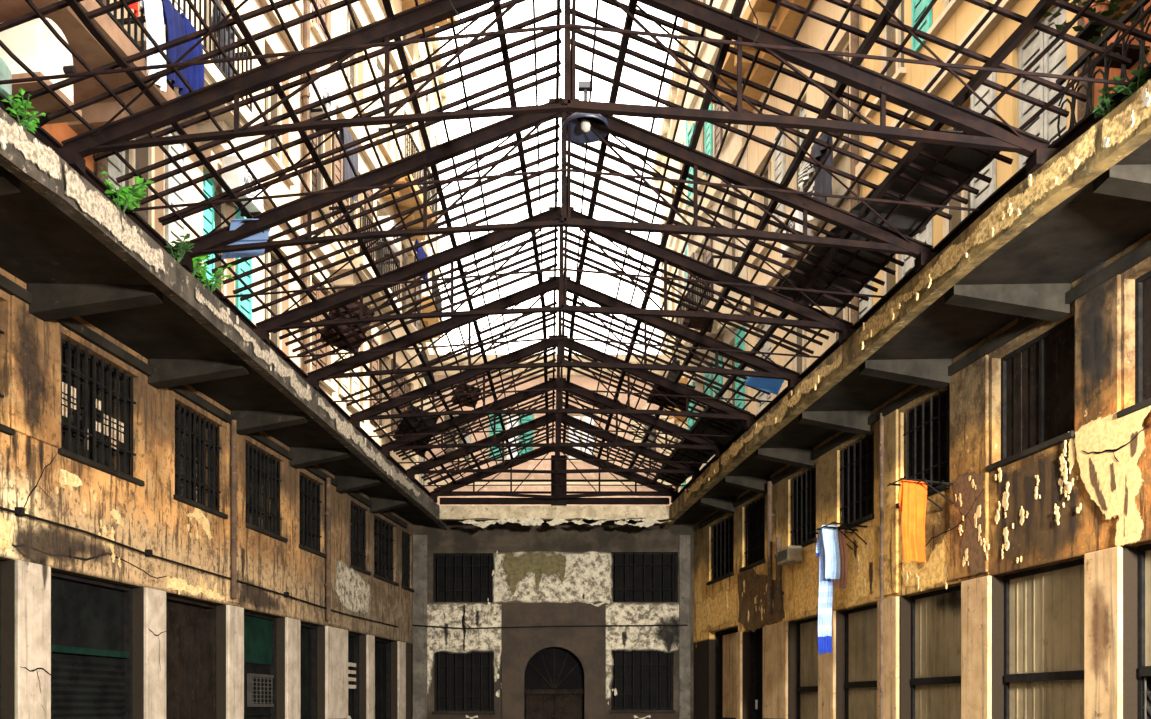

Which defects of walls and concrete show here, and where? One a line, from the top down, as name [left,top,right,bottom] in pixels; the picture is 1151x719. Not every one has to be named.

spalling [0,117,166,273]
water stain [7,318,46,484]
peeling [1059,405,1151,546]
water stain [15,528,112,586]
peeling [427,551,679,705]
spalling [695,549,819,643]